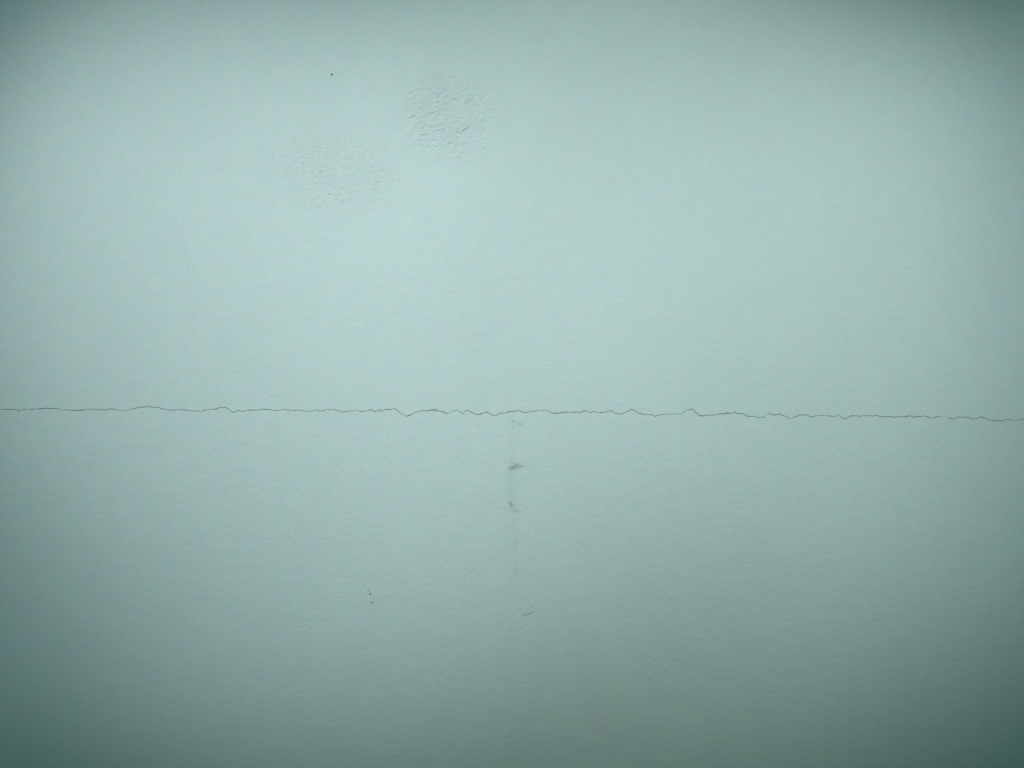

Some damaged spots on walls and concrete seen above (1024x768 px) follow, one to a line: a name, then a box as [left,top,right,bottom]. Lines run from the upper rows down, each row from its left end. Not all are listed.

crack [0,406,1024,421]